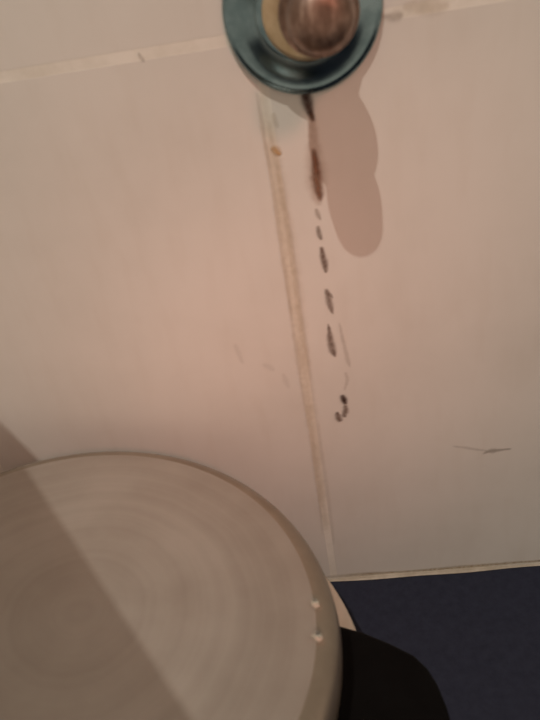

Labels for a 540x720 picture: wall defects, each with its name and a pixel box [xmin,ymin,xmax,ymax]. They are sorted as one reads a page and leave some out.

rust [302,94,314,121]
rust [312,151,322,199]